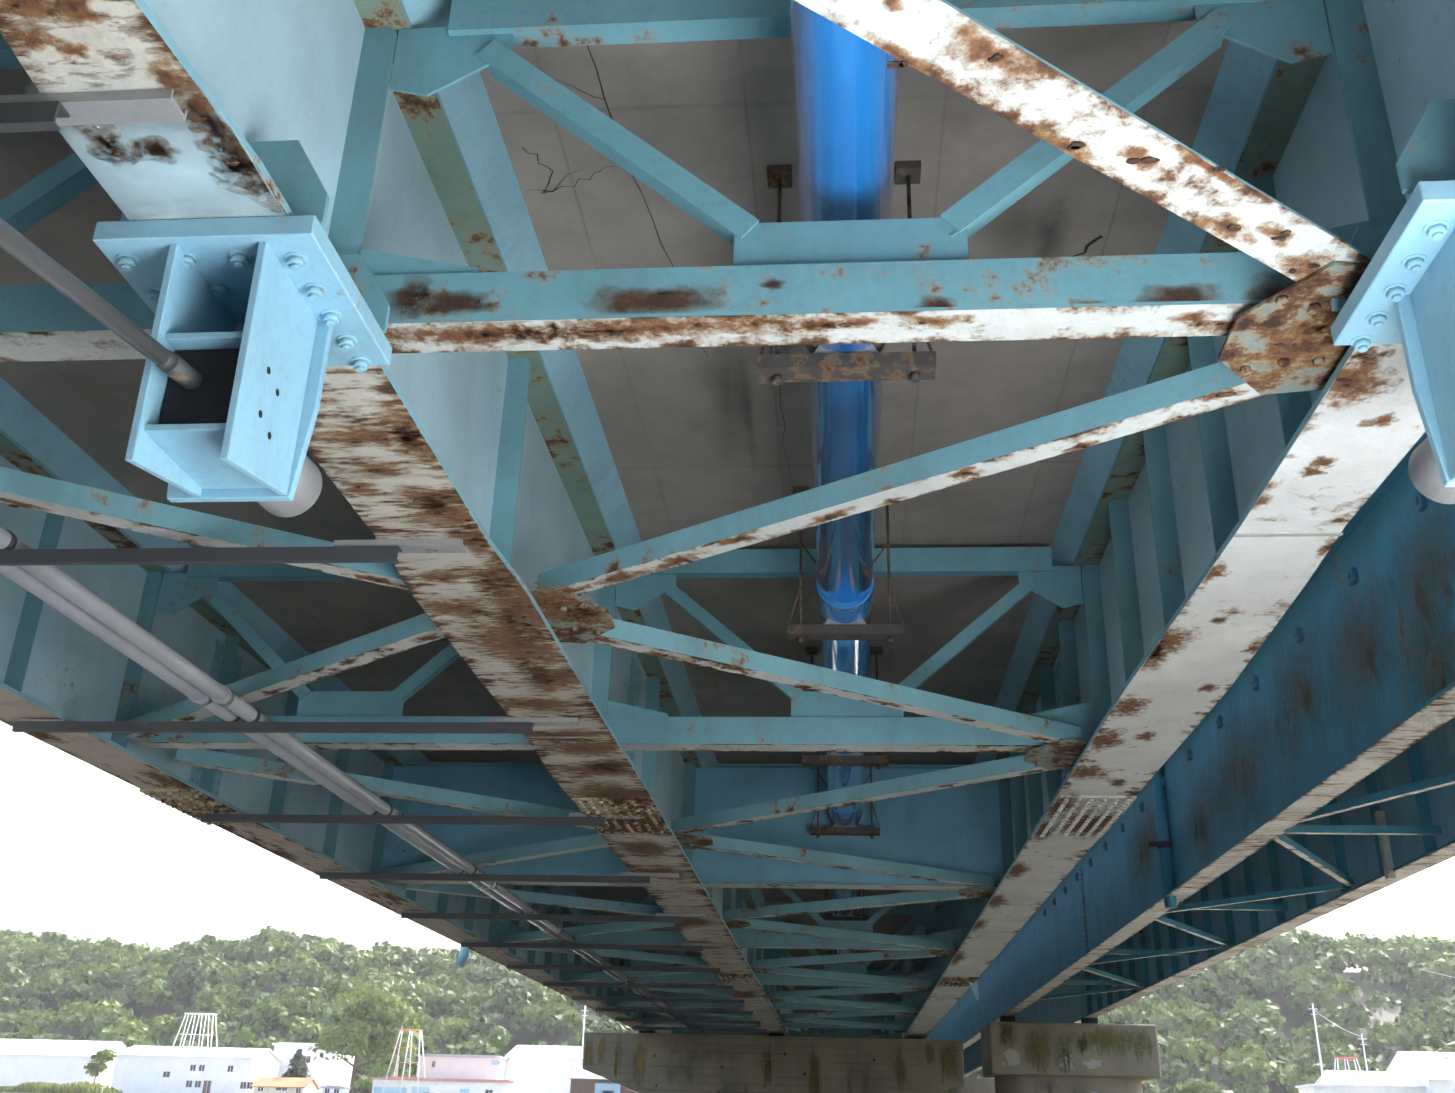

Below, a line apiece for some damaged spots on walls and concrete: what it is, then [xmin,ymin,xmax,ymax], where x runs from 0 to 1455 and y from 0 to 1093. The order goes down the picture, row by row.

rust [0,0,100,60]
crack [557,45,613,120]
rust [946,24,1035,76]
rust [149,59,271,196]
rust [1117,146,1160,171]
crack [522,147,674,267]
rust [1197,212,1334,299]
rust [384,282,878,347]
rust [913,298,973,329]
rust [1203,311,1404,408]
rust [315,403,700,880]
leakage [585,1039,644,1083]